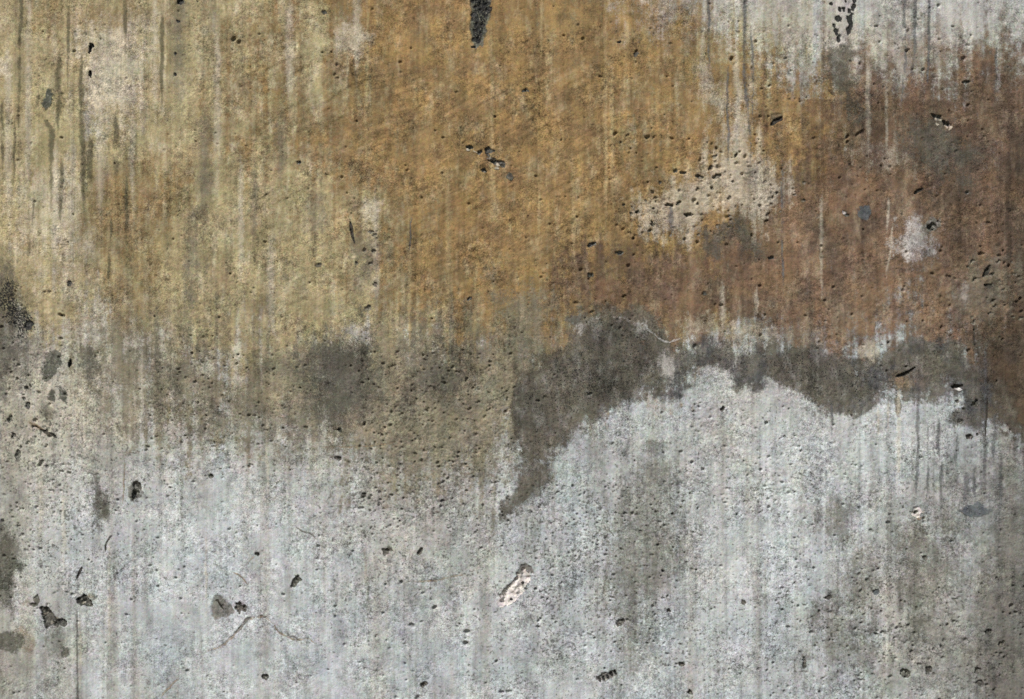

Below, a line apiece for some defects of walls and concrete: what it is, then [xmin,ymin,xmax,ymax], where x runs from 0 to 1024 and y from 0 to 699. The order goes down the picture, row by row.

leakage [0,0,1024,534]
corrosion [199,0,867,364]
spalling [496,563,534,608]